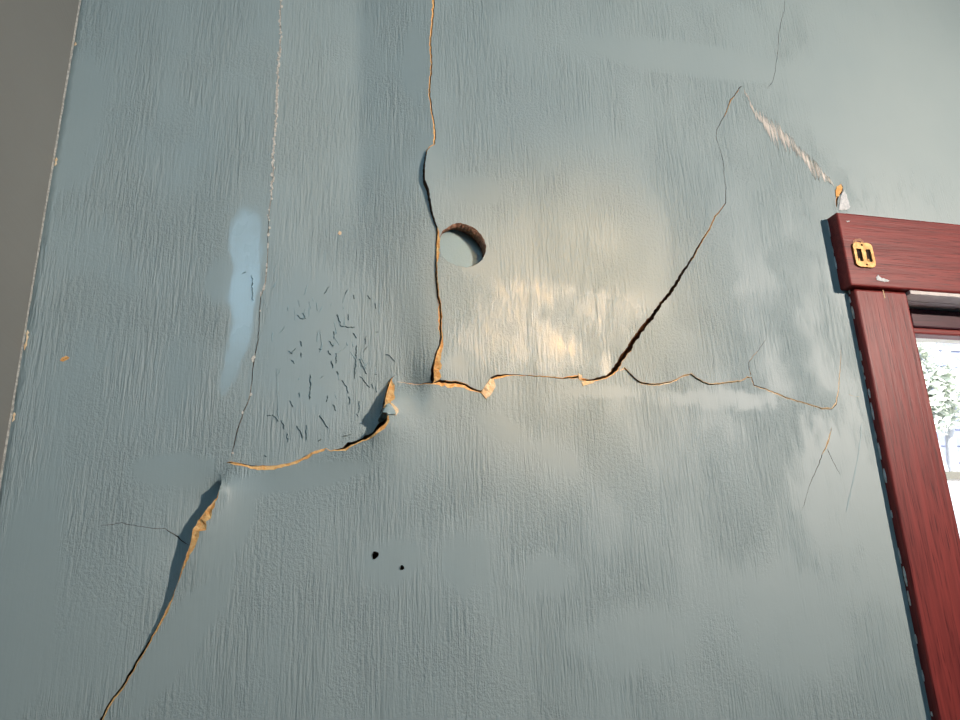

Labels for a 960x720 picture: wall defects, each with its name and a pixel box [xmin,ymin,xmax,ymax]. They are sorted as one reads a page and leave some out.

crack [227,0,858,503]
peeling [744,90,850,210]
crack [100,488,220,720]